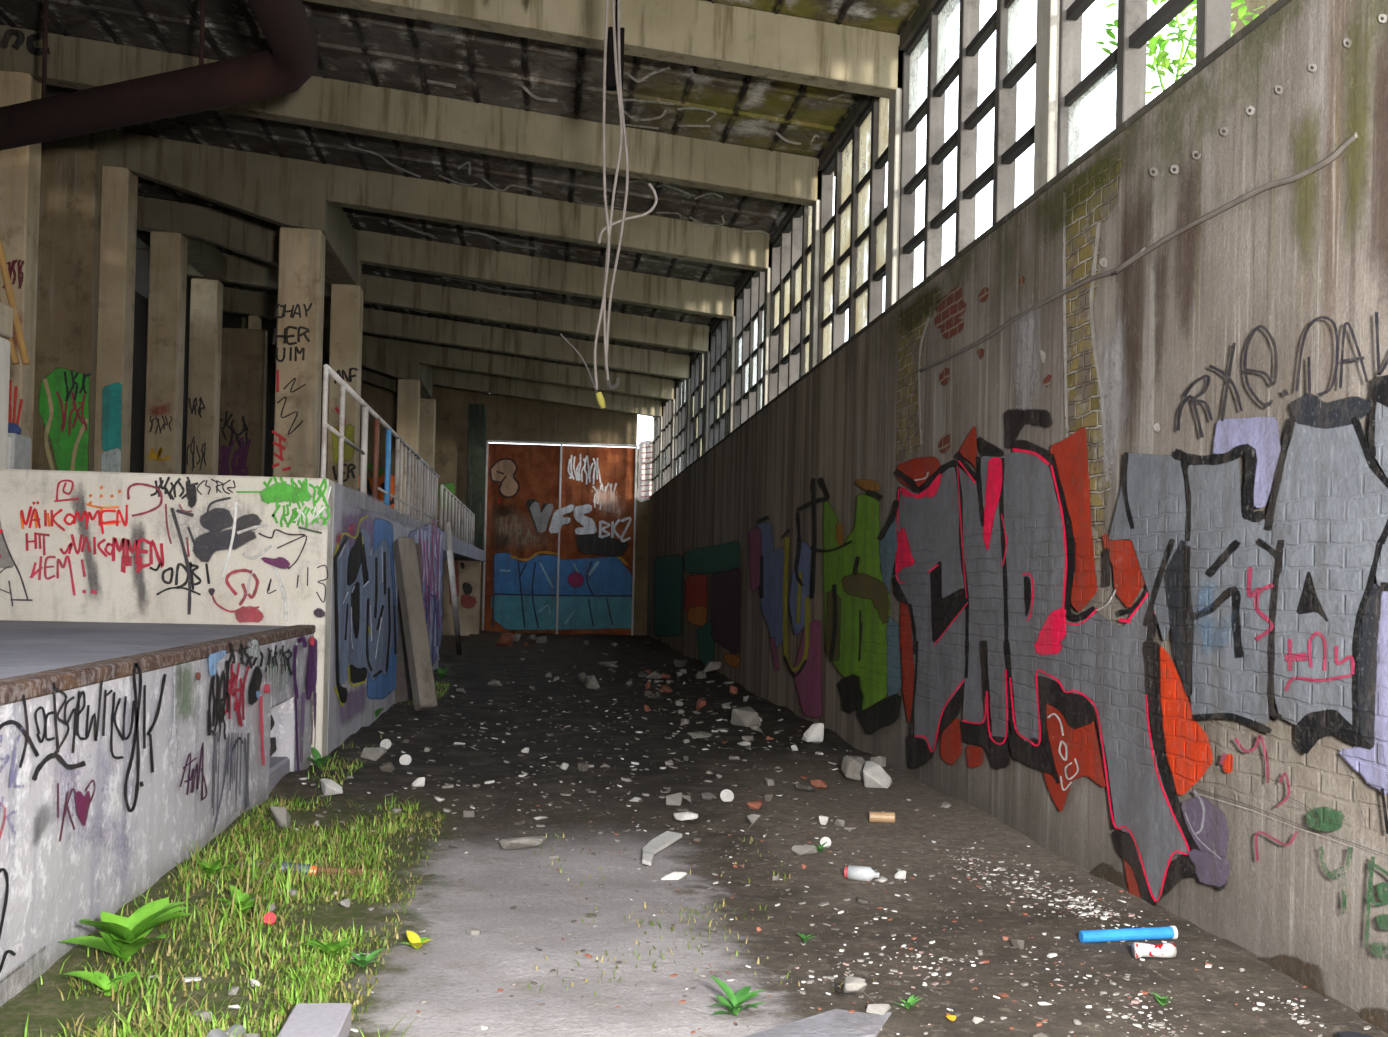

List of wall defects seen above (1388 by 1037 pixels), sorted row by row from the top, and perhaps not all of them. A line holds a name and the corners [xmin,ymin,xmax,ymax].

damp [1296,121,1318,252]
damp [1347,24,1388,270]
flaking render [938,433,950,453]
damp [1016,311,1038,410]
flaking render [1039,156,1122,563]
damp [1100,172,1199,470]